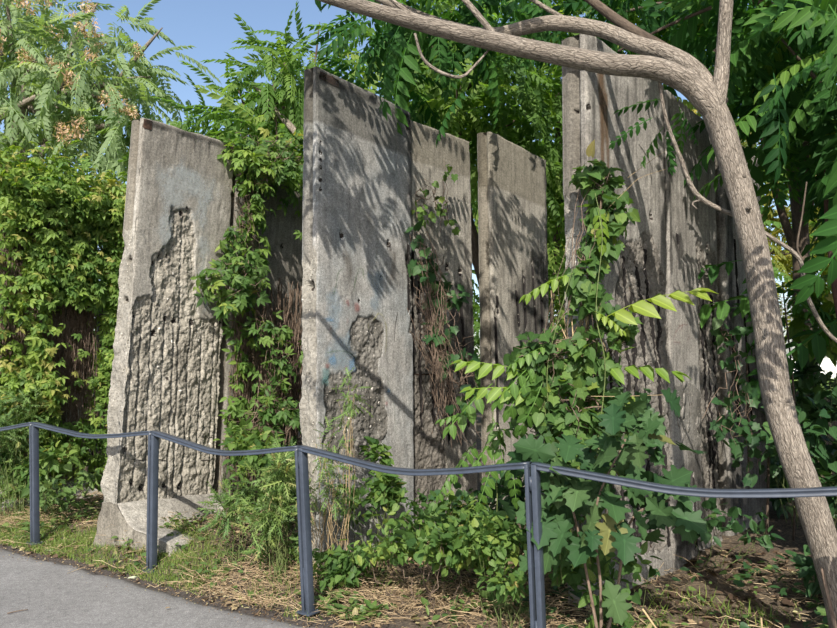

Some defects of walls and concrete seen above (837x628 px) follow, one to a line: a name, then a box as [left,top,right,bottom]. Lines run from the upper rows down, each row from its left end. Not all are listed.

damp [664,142,683,263]
damp [725,193,733,260]
spalling [101,166,223,505]
damp [515,252,549,343]
damp [729,271,738,362]
damp [448,366,473,440]
damp [731,455,743,517]